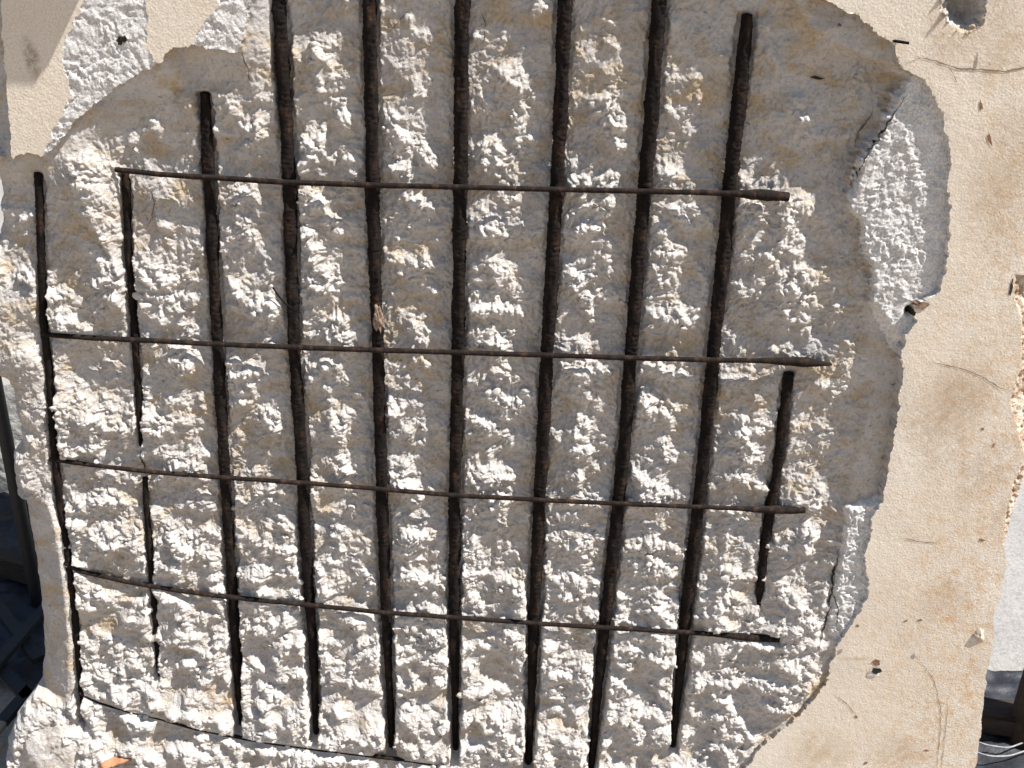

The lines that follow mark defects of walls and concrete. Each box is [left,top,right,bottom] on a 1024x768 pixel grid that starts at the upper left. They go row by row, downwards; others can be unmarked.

spalling [939,0,988,35]
crack [911,58,1024,82]
crack [855,97,905,178]
rust [373,304,384,333]
spalling [0,0,652,768]
spalling [594,0,952,768]
crack [820,552,839,642]